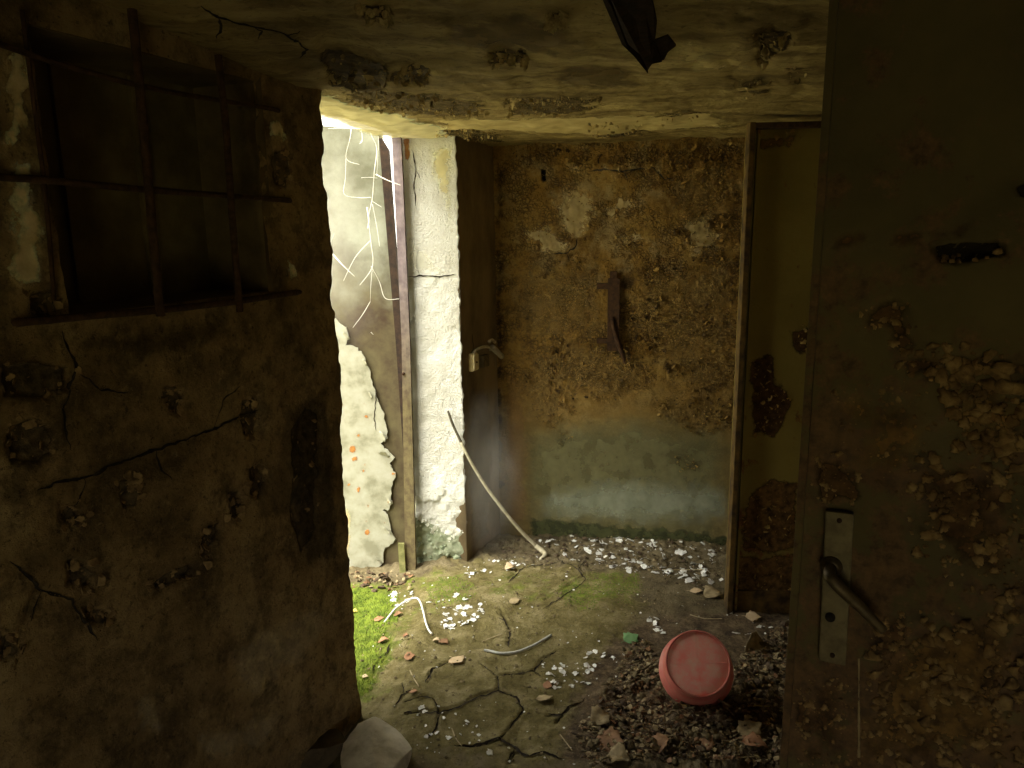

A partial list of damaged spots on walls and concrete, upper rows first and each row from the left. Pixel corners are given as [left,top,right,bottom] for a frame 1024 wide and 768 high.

crack [201,6,309,58]
spalling [320,49,644,143]
crack [409,252,454,278]
crack [61,330,130,450]
crack [38,386,257,512]
damp [553,487,722,514]
crack [10,561,98,641]